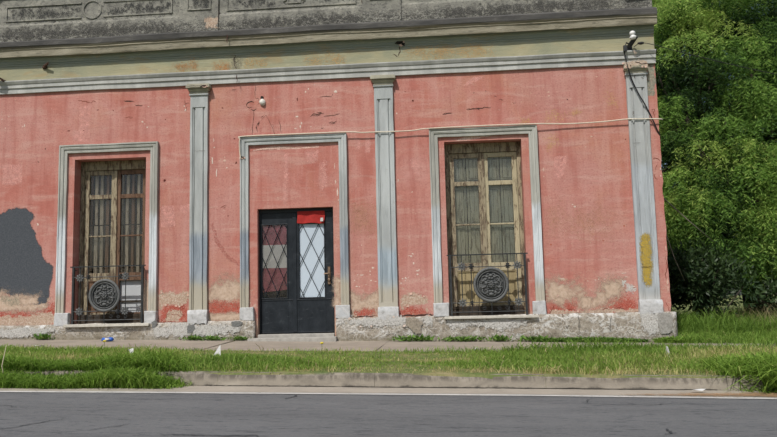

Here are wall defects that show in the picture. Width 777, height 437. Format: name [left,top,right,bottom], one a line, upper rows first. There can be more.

peeling [0,303,55,339]
peeling [152,290,242,338]
peeling [335,292,529,332]